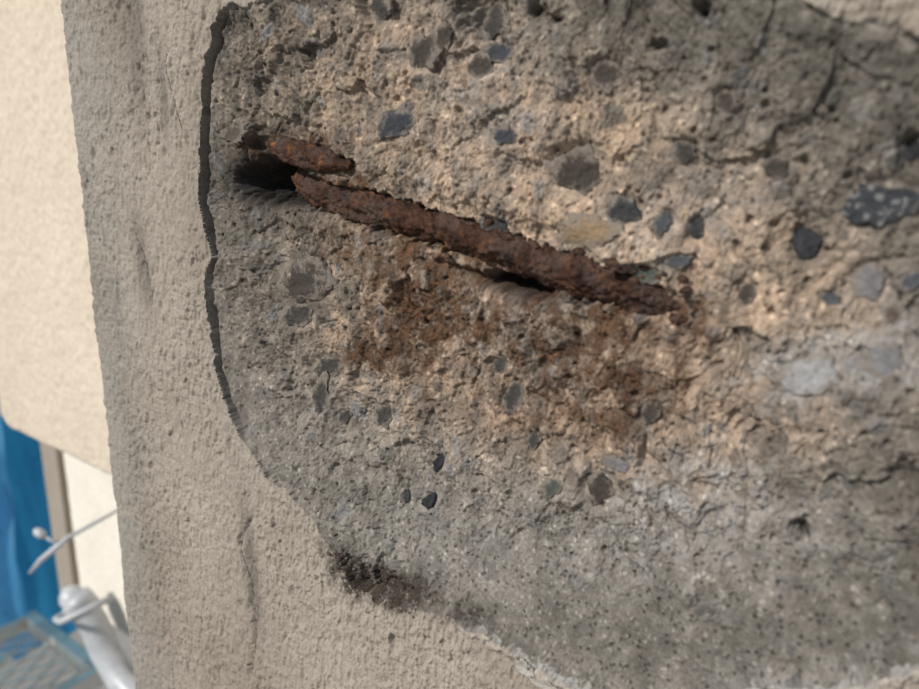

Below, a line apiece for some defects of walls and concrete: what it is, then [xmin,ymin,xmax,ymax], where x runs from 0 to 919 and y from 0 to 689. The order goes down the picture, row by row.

rust [336,226,664,440]
spalling [198,0,919,689]
rust [668,275,706,352]